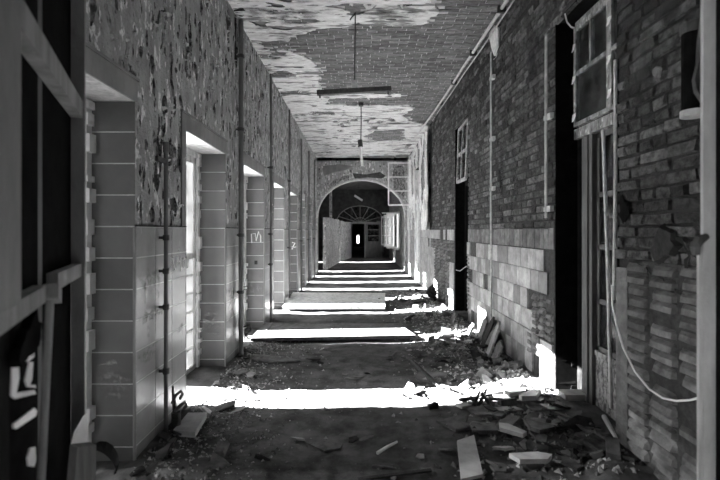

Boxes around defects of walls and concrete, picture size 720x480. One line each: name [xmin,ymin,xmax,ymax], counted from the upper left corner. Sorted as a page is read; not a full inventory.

spalling [184,12,192,77]
spalling [154,6,186,192]
spalling [206,0,513,272]
spalling [619,195,629,223]
peeling [527,290,554,357]